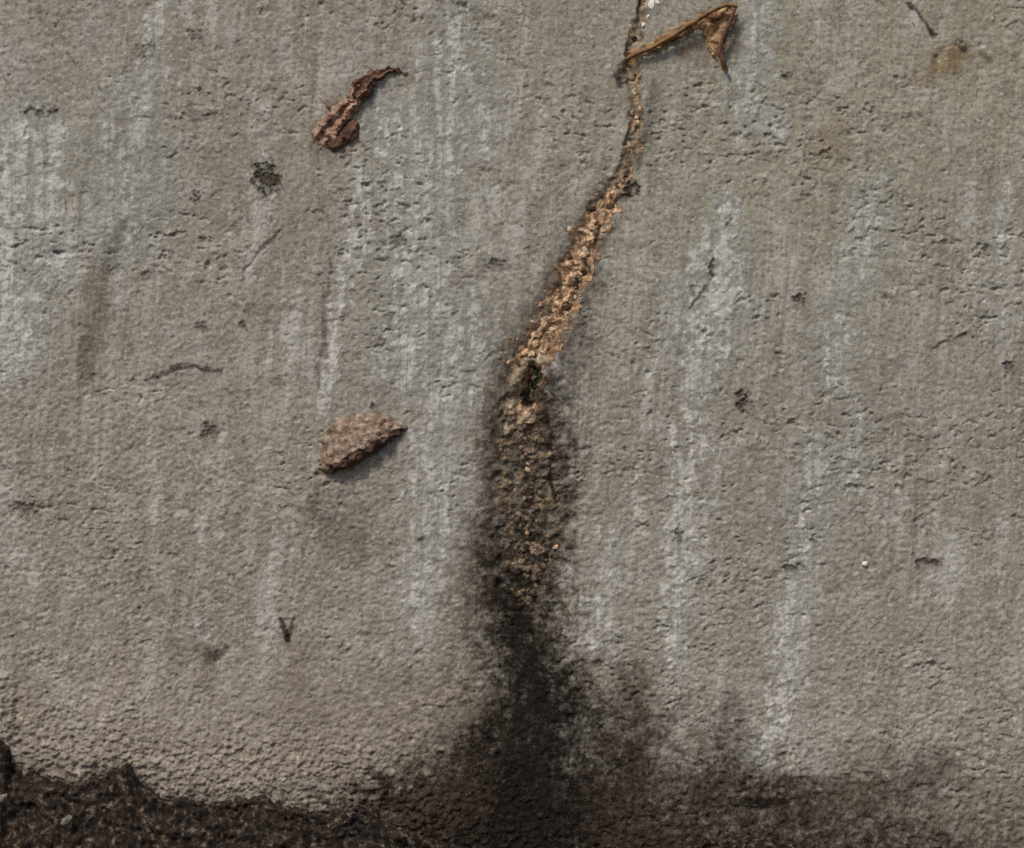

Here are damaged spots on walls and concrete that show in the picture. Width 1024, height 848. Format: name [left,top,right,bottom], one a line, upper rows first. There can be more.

crack [494,0,660,604]
leakage [274,0,1024,848]